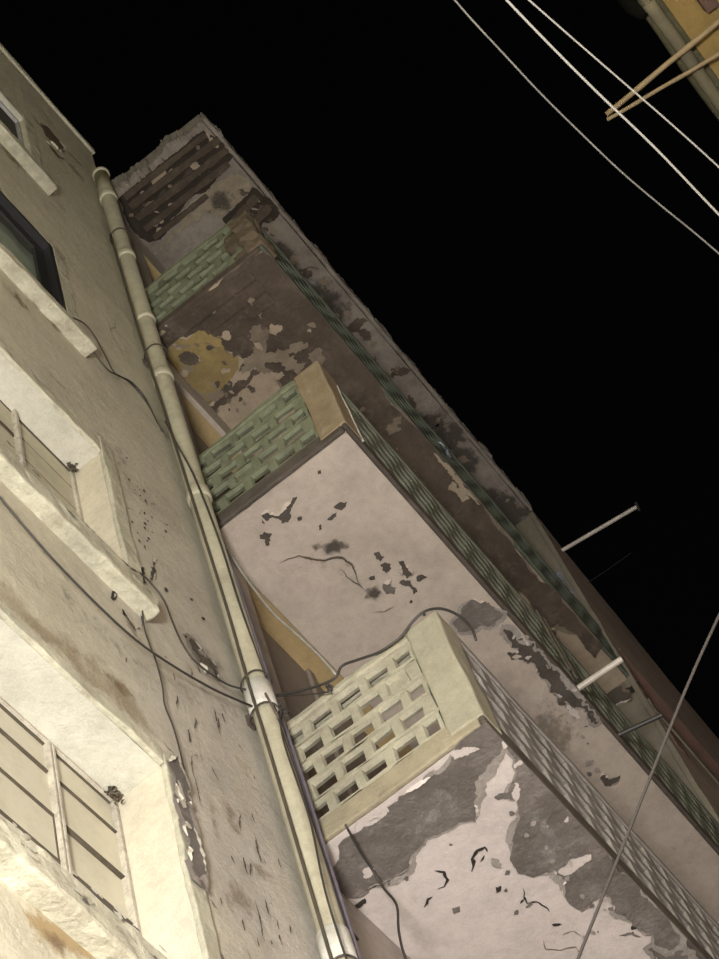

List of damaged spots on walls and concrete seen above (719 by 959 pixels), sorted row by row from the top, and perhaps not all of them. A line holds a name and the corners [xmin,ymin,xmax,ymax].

flaking render [34,118,80,164]
damp [230,189,377,361]
peeling [111,112,603,658]
damp [423,414,479,472]
flaking render [48,486,157,593]
crack [280,555,364,589]
damp [485,488,530,526]
flaking render [164,742,291,946]
peeling [333,722,705,959]
crack [424,870,460,914]
crack [495,886,581,952]